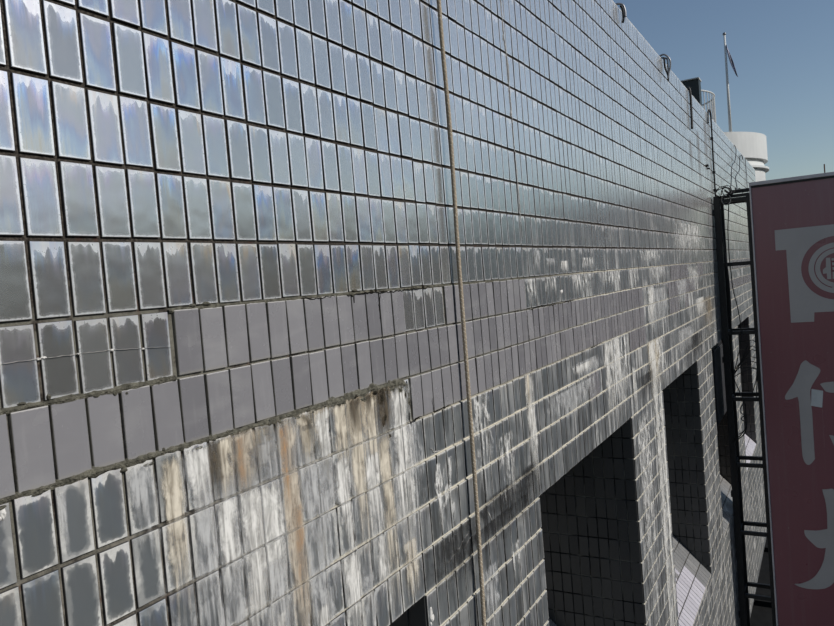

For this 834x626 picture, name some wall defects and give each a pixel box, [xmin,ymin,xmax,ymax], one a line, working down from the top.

damp [648,288,666,320]
damp [556,335,637,413]
damp [473,396,489,451]
damp [525,375,538,453]
rust [235,434,252,475]
damp [435,458,454,509]
damp [638,338,675,608]
rust [279,425,309,607]
damp [483,565,499,620]